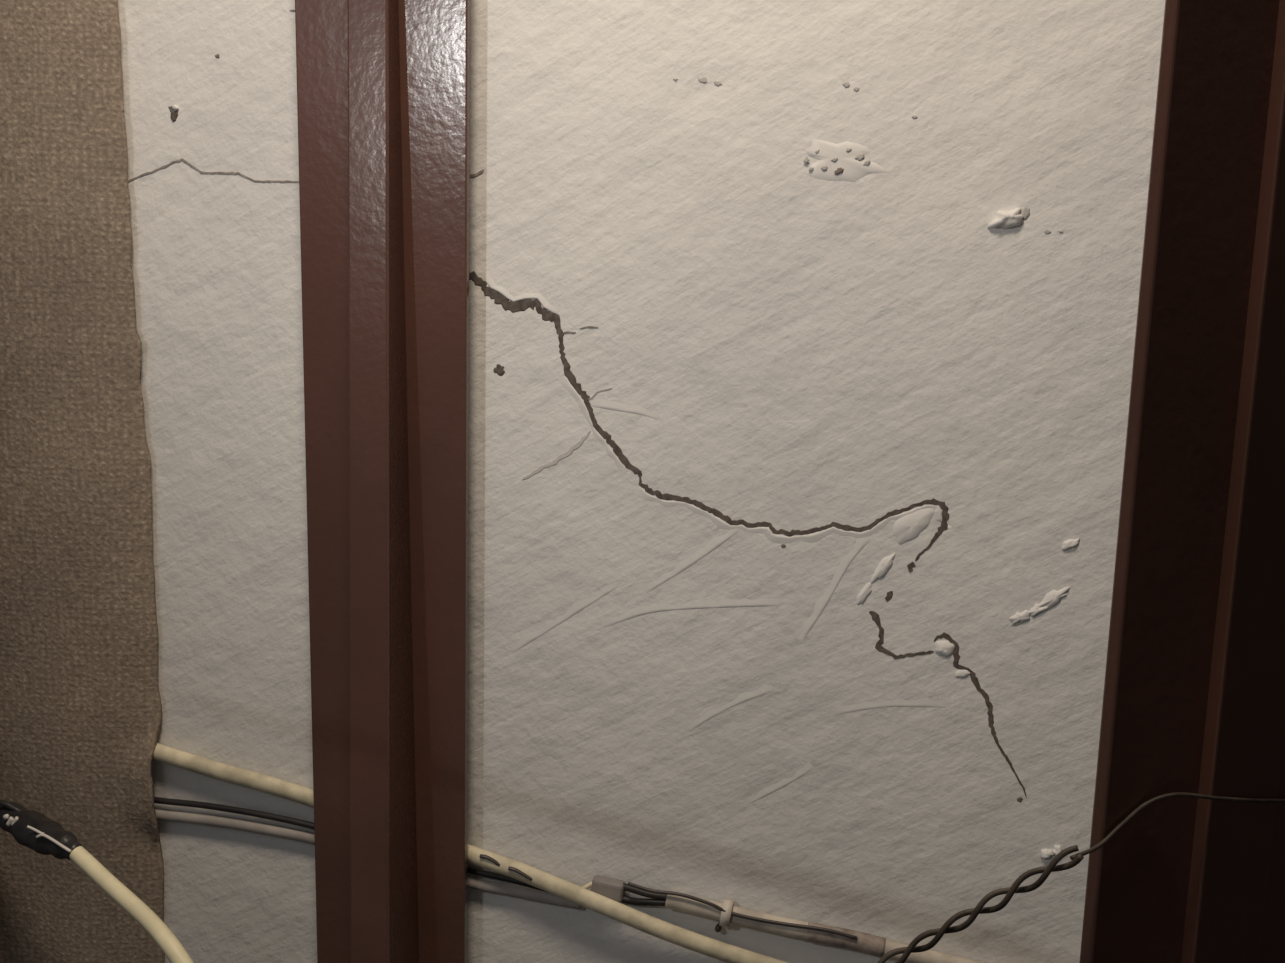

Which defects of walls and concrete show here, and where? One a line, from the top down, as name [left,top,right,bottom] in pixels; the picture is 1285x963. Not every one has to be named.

crack [128,158,299,183]
crack [469,169,484,178]
crack [469,271,1027,797]